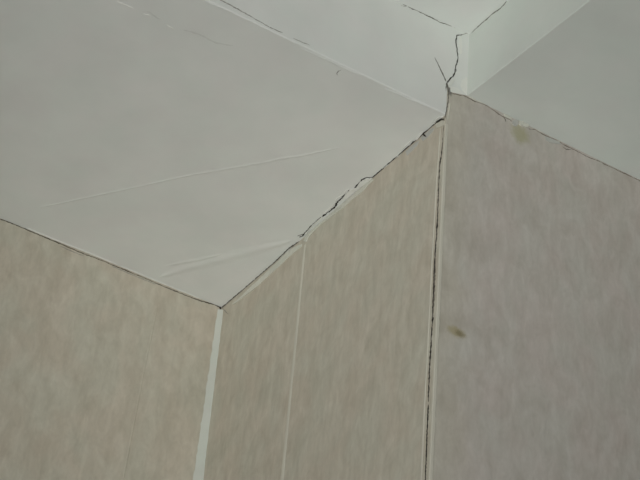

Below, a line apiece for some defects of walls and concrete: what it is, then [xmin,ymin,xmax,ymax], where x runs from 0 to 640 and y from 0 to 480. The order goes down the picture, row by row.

crack [1,0,512,480]
crack [532,128,640,181]